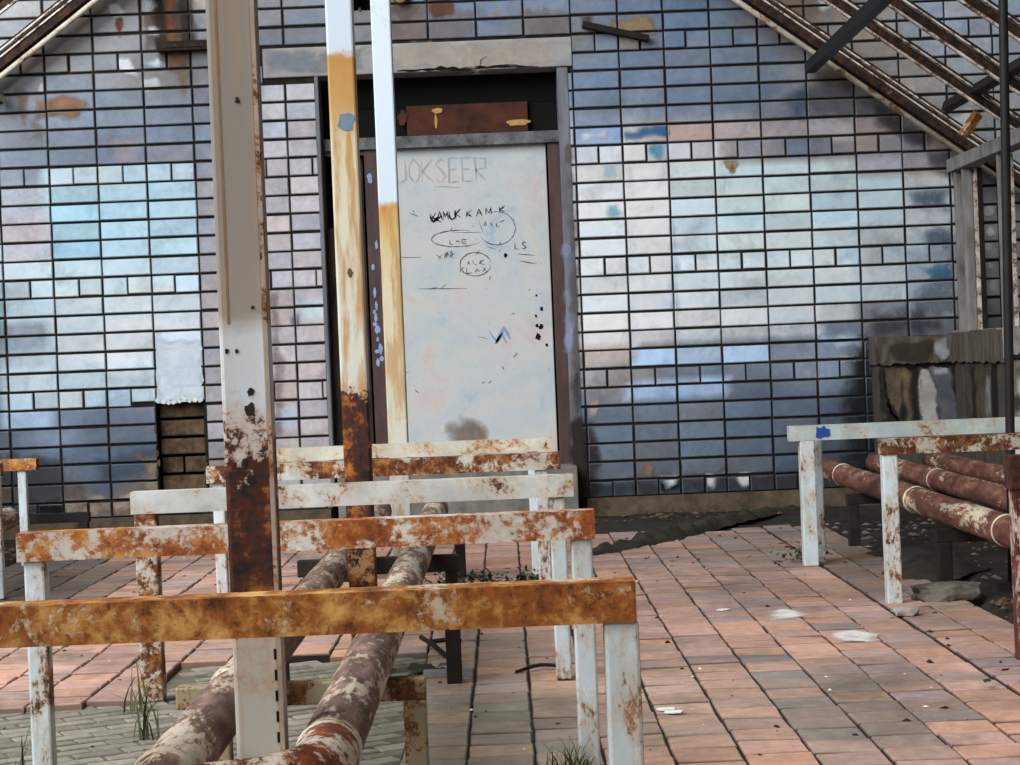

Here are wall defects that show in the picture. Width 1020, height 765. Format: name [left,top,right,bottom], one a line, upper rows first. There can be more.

rust [244,388,255,416]
water stain [448,422,485,441]